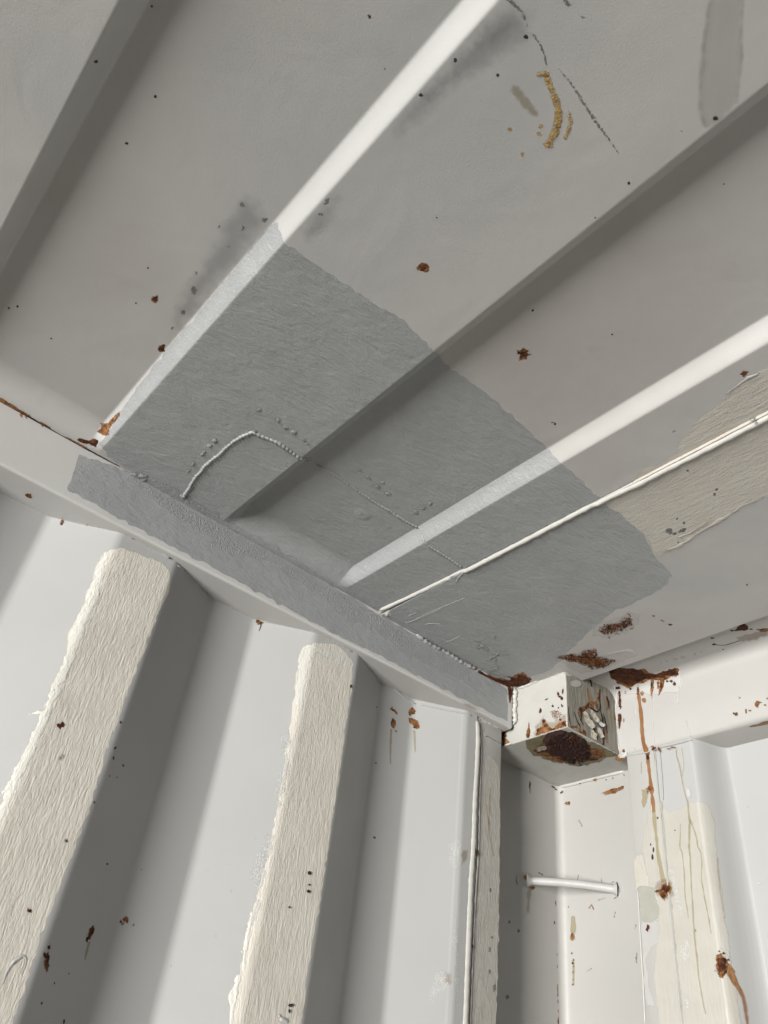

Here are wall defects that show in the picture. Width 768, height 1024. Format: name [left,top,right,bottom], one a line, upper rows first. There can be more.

corrosion [78,413,120,447]
corrosion [478,670,532,703]
corrosion [526,689,626,763]
corrosion [557,611,679,812]
corrosion [654,882,672,901]
corrosion [716,948,748,1024]